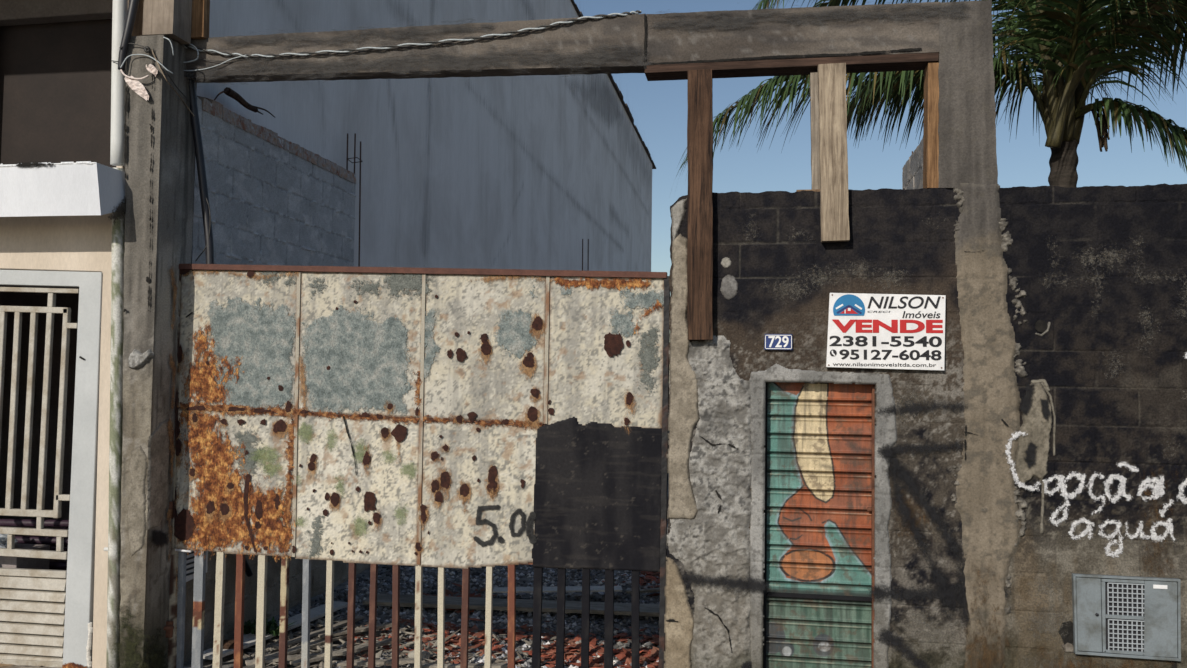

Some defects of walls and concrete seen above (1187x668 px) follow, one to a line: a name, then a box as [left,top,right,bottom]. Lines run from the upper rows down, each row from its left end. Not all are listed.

flaking render [953,188,965,231]
rust [481,275,651,291]
rust [529,313,545,339]
rust [604,300,662,357]
rust [622,390,636,433]
rust [167,325,554,561]